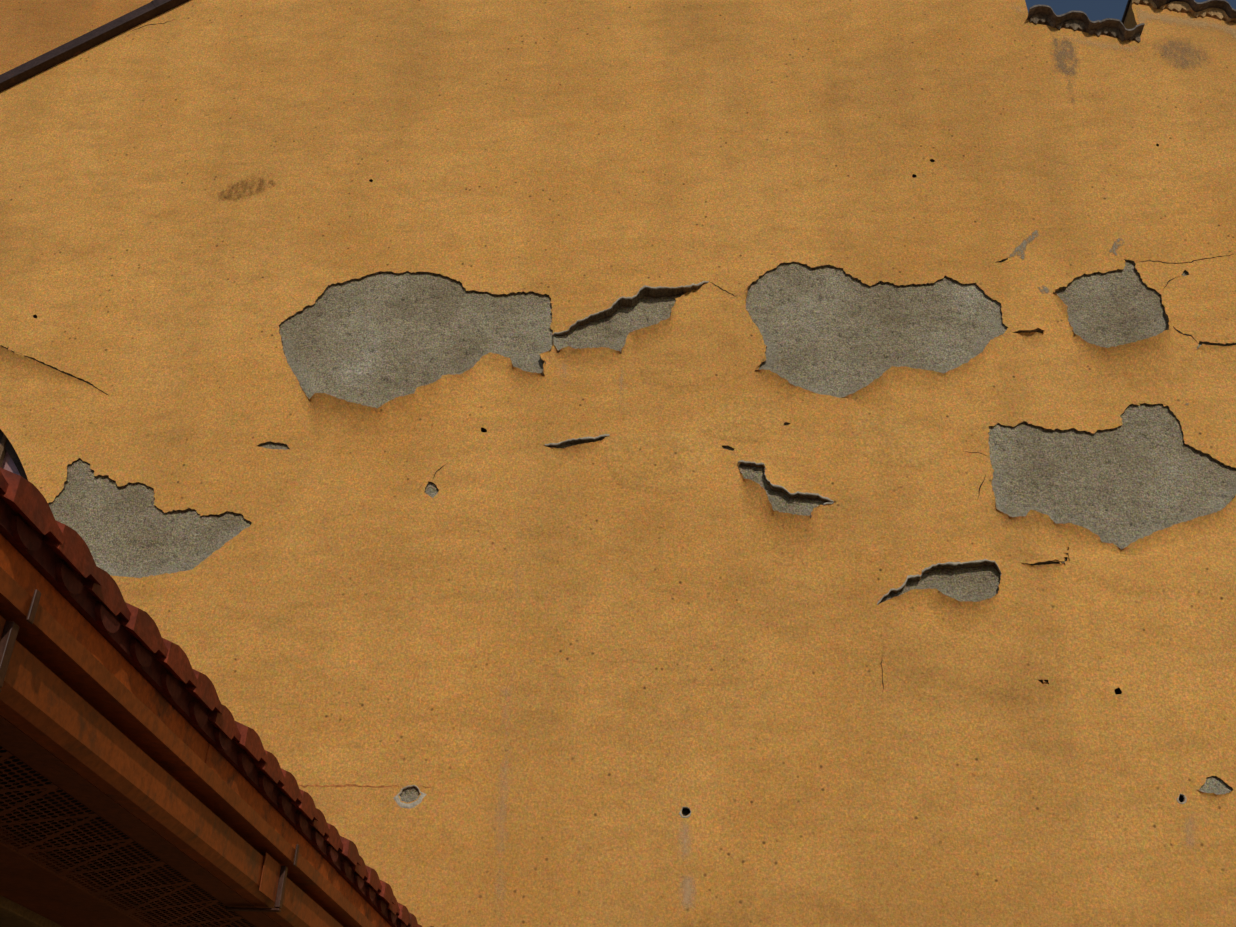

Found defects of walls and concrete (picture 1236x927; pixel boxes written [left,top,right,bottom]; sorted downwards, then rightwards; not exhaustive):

peeling [1010,230,1038,259]
crack [1140,254,1233,288]
crack [0,345,108,395]
flaking render [279,271,709,450]
flaking render [738,262,1008,410]
flaking render [986,239,1236,561]
crack [1173,326,1236,358]
flaking render [48,458,252,578]
flaking render [733,453,839,569]
flaking render [876,543,1006,634]